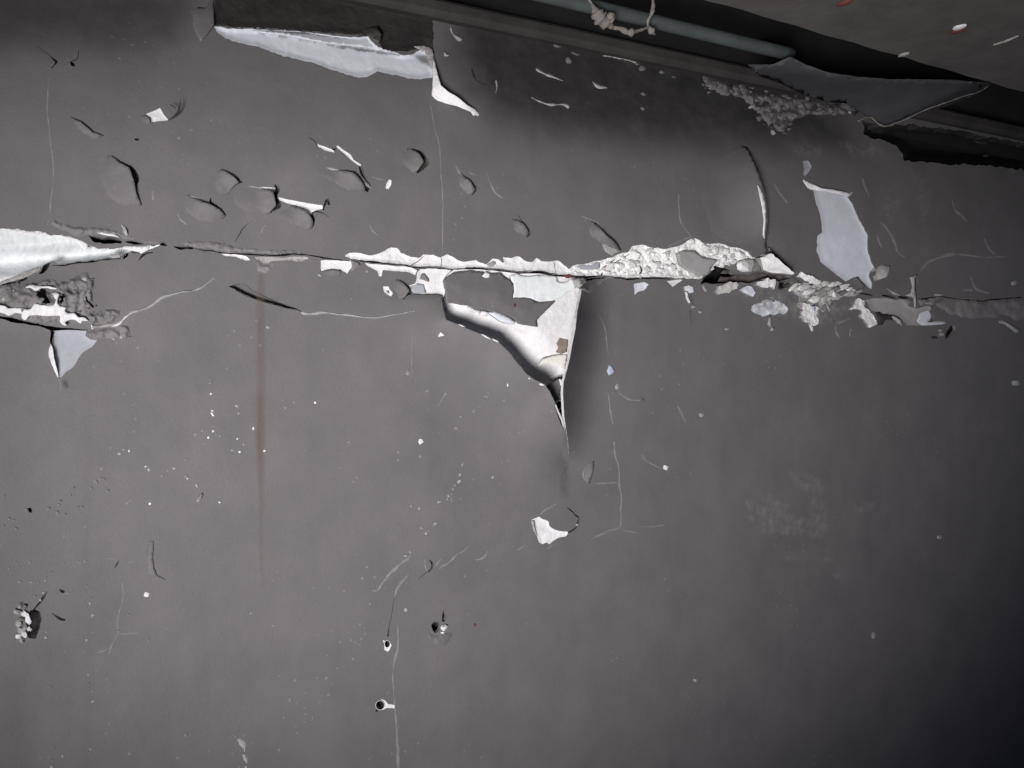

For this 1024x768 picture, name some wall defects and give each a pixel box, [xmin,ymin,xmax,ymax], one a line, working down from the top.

peeling [186,0,480,116]
crack [2,225,671,285]
crack [0,297,94,331]
spalling [0,225,159,394]
peeling [220,138,953,451]
crack [689,294,702,335]
crack [860,292,1024,302]
peeling [531,504,580,545]
spalling [13,592,65,643]